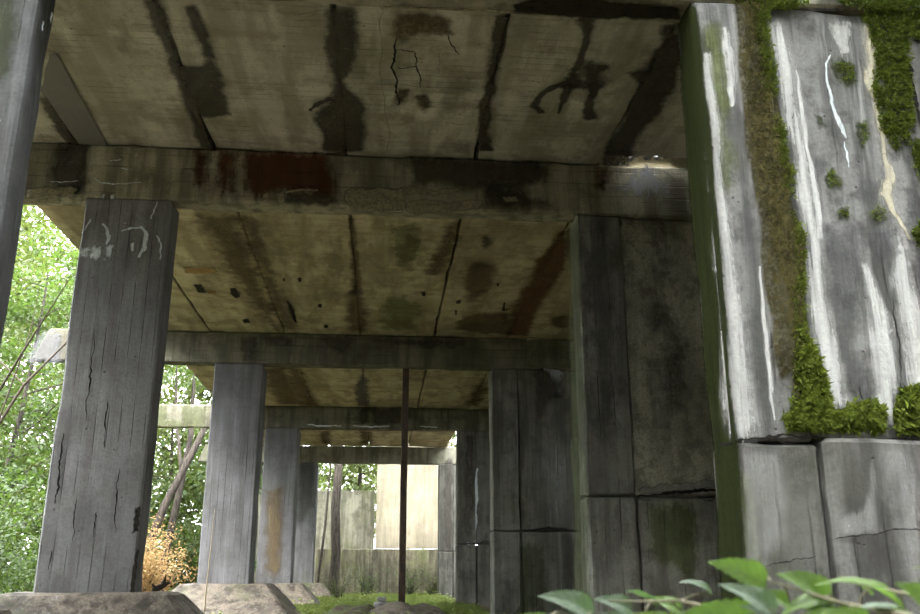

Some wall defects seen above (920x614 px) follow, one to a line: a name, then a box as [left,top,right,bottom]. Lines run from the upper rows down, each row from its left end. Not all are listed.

leakage [144,0,229,148]
leakage [309,7,365,152]
crack [344,14,472,151]
leakage [825,55,849,167]
leakage [768,25,842,404]
leakage [865,27,920,384]
crack [54,433,120,542]
crack [85,329,108,447]
crack [627,488,716,501]
crack [720,433,818,446]
crack [835,528,920,539]
leakage [862,265,896,420]